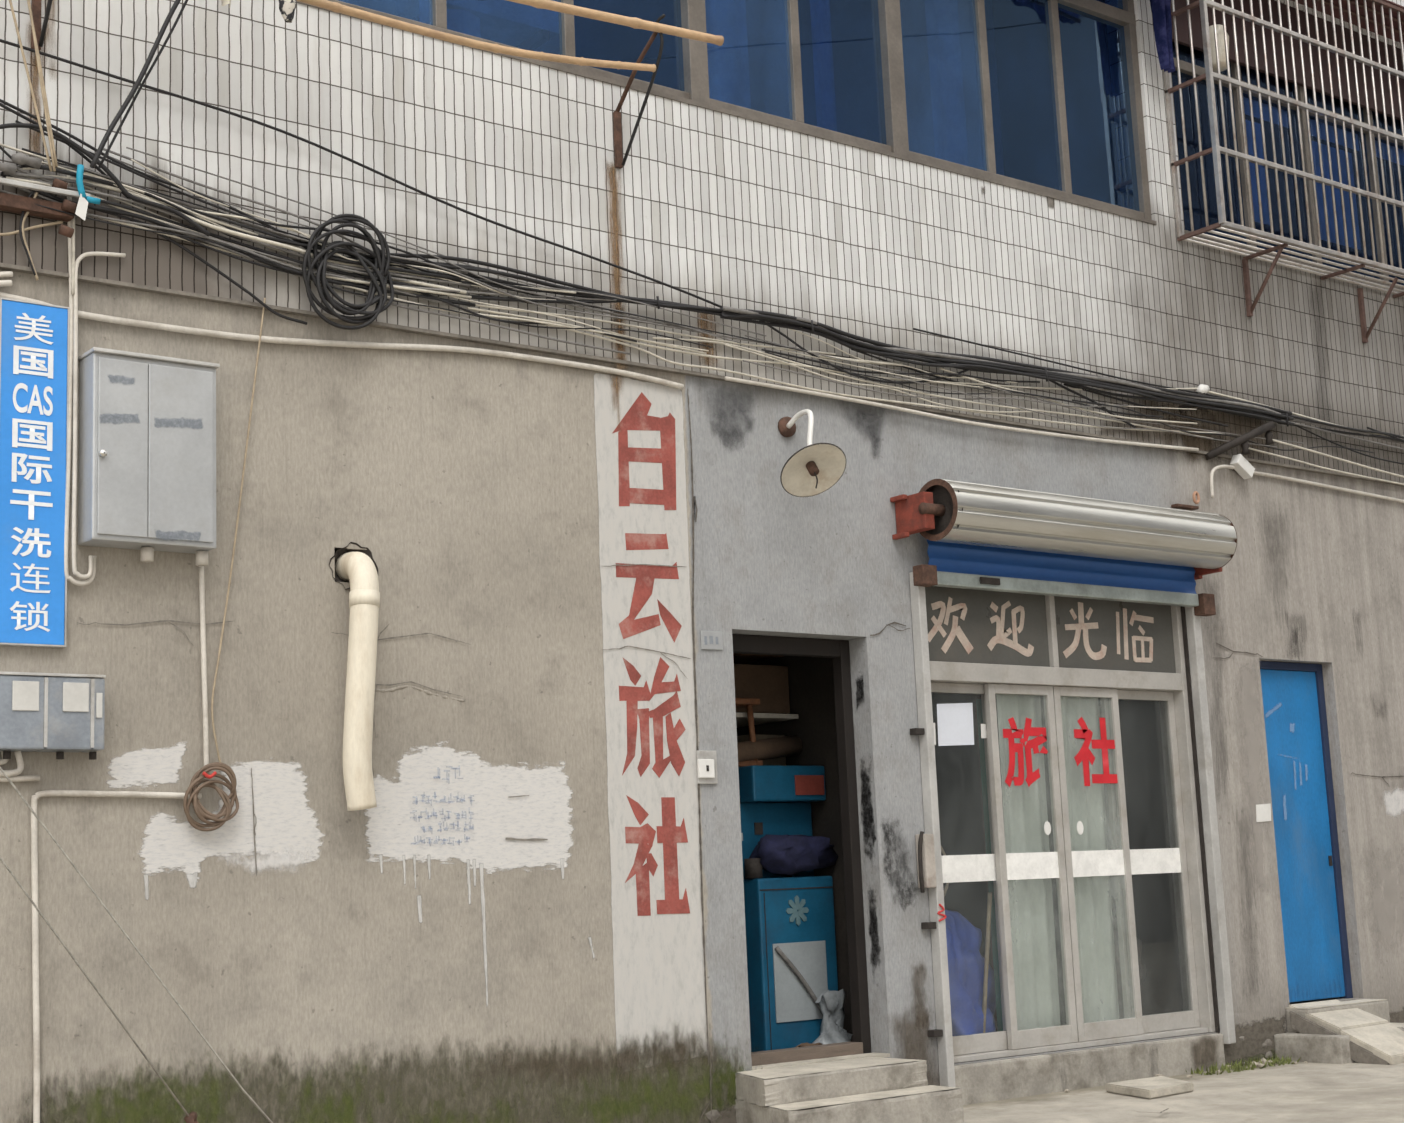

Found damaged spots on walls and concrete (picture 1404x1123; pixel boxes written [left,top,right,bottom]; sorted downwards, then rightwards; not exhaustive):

rust [607,165,625,399]